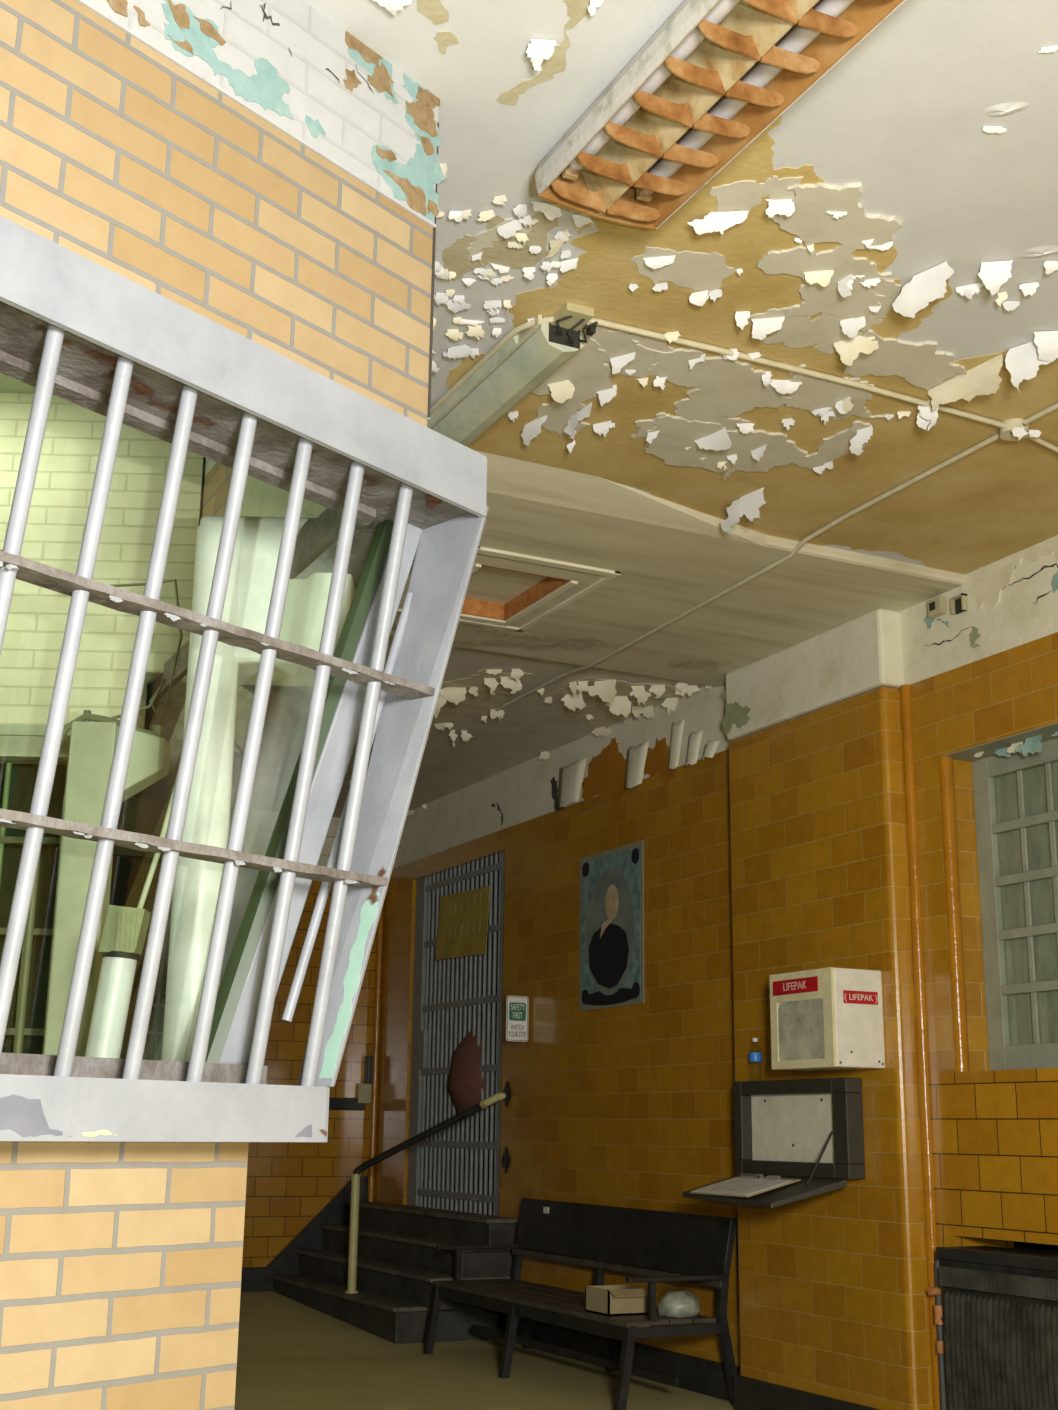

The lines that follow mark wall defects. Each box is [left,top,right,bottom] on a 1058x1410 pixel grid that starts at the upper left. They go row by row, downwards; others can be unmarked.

peeling [107,0,326,138]
peeling [373,0,459,55]
peeling [343,31,1058,575]
crack [1001,563,1058,604]
peeling [426,669,751,808]